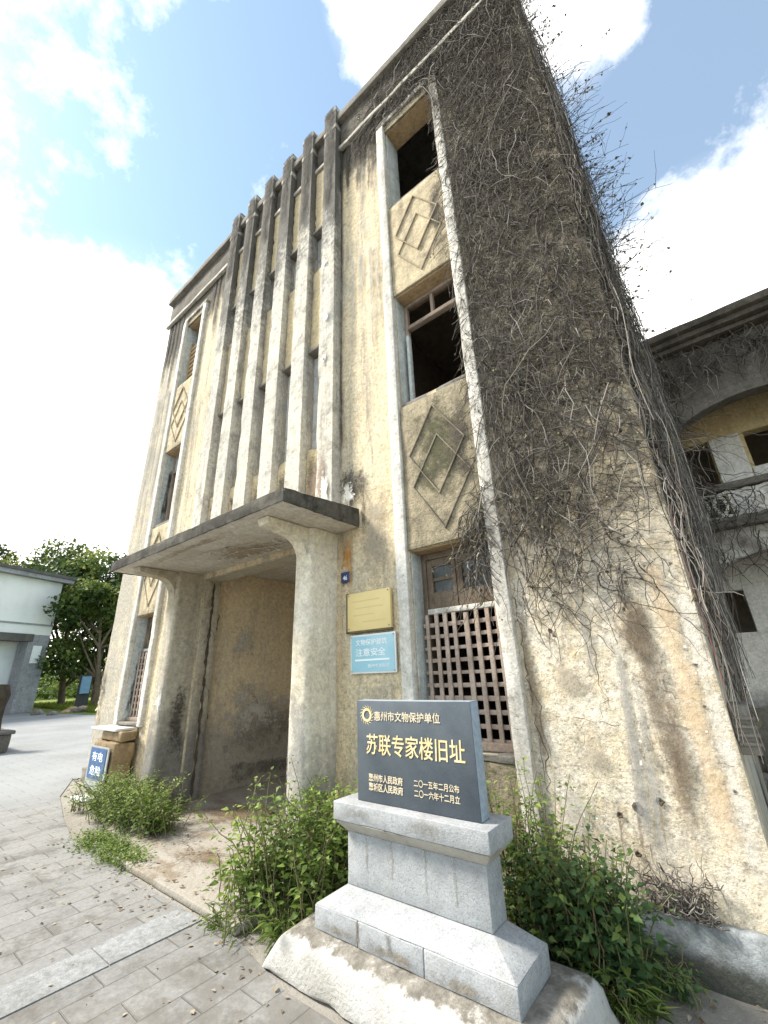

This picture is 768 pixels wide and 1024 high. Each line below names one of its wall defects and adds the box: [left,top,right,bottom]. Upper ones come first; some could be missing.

crack [190,582,221,797]
damp [617,592,698,847]